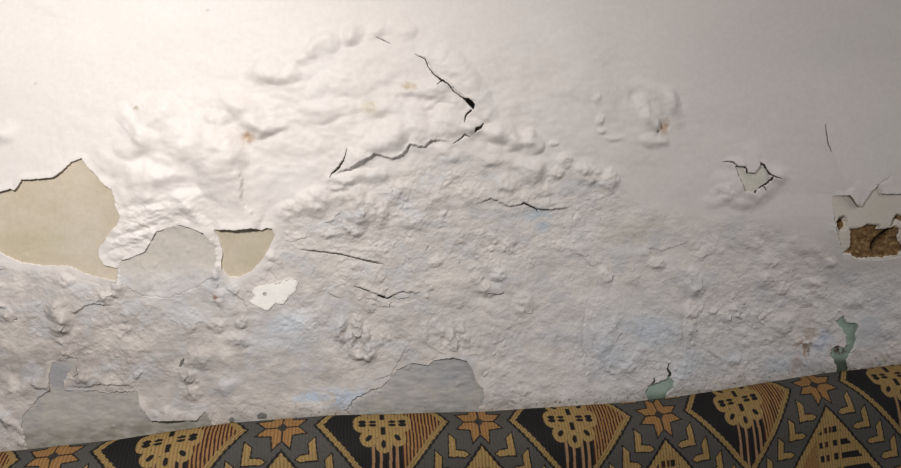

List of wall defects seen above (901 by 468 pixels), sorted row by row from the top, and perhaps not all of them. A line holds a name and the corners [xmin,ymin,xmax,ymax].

crack [416,54,484,143]
crack [724,161,782,193]
peeling [0,152,278,298]
peeling [832,185,901,261]
peeling [830,316,863,372]
peeling [344,352,489,415]
peeling [645,376,679,400]